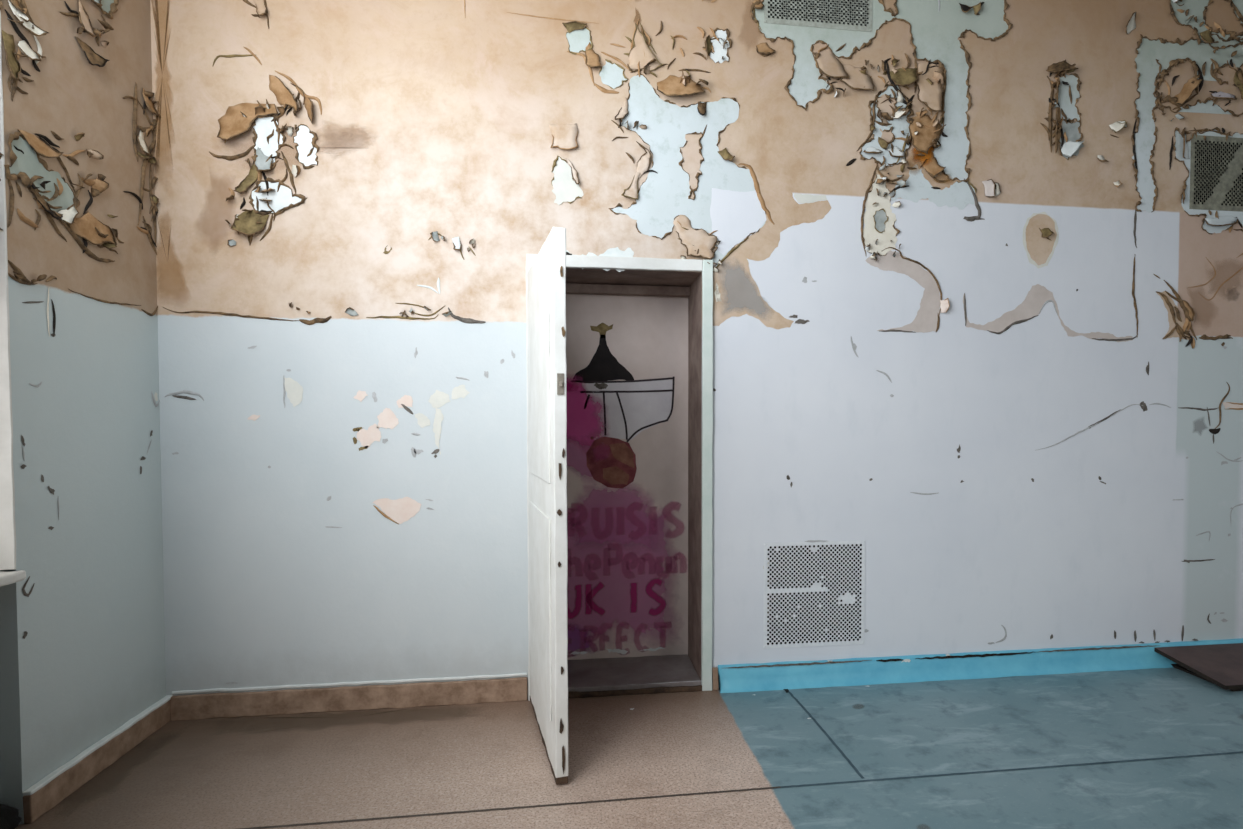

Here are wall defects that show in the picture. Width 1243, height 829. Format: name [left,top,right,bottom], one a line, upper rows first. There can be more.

peeling [0,0,49,102]
peeling [0,129,124,263]
peeling [123,82,161,255]
peeling [209,47,322,246]
peeling [549,123,584,205]
peeling [560,20,831,329]
peeling [750,0,1137,342]
peeling [1109,0,1243,234]
peeling [69,289,331,325]
peeling [345,278,486,324]
crack [1038,207,1230,450]
peeling [1154,274,1233,349]